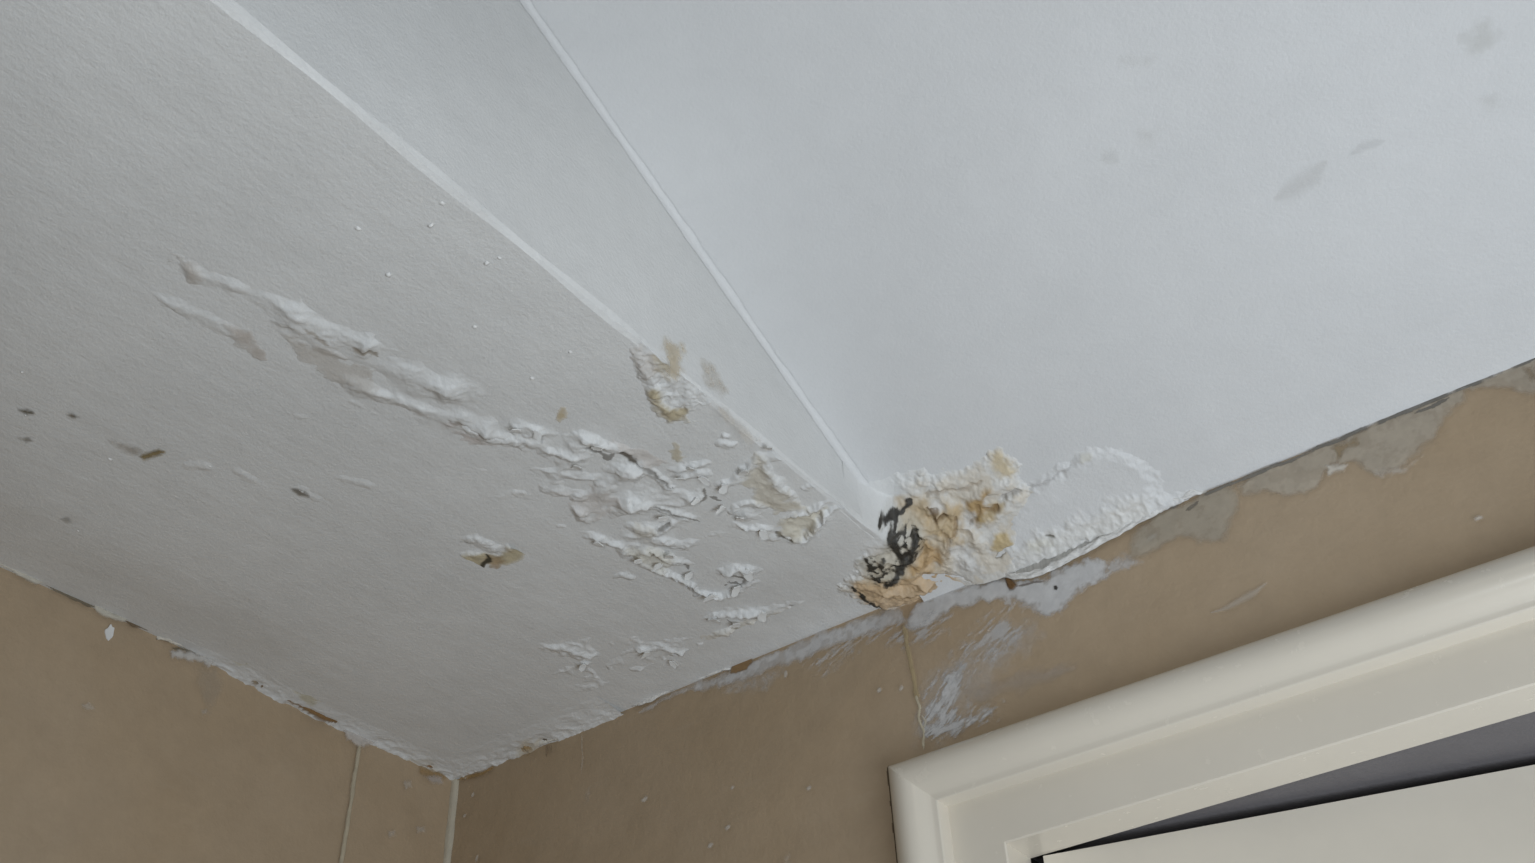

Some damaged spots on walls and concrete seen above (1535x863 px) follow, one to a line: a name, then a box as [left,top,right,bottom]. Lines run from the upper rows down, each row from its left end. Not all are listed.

peeling [151,252,513,449]
peeling [290,485,324,502]
flaking render [836,360,1535,611]
spalling [459,533,526,569]
mould [851,498,924,608]